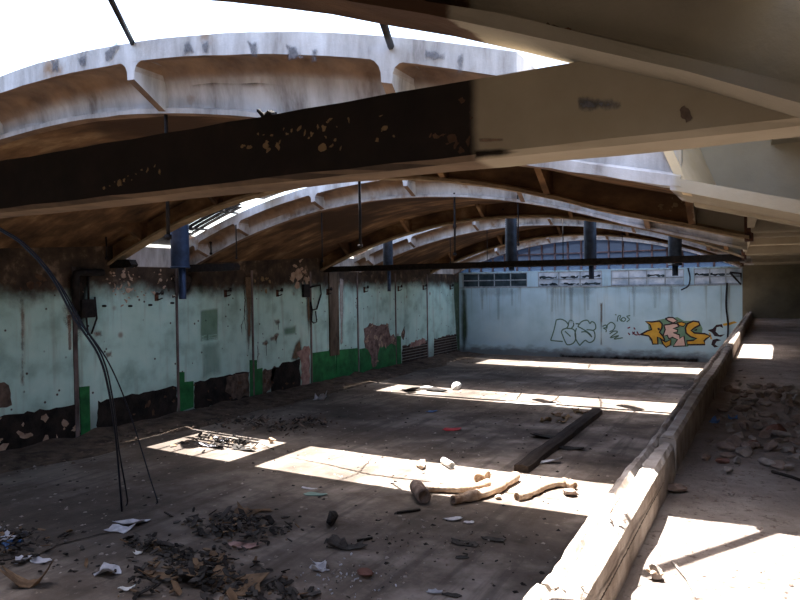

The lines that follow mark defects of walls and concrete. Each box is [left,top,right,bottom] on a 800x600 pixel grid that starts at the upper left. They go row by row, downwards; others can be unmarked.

peeling [257,118,342,153]
peeling [289,259,310,289]
flaking render [364,323,457,367]
flaking render [0,382,81,451]
flaking render [96,386,178,428]
flaking render [194,372,250,409]
flaking render [263,346,310,394]